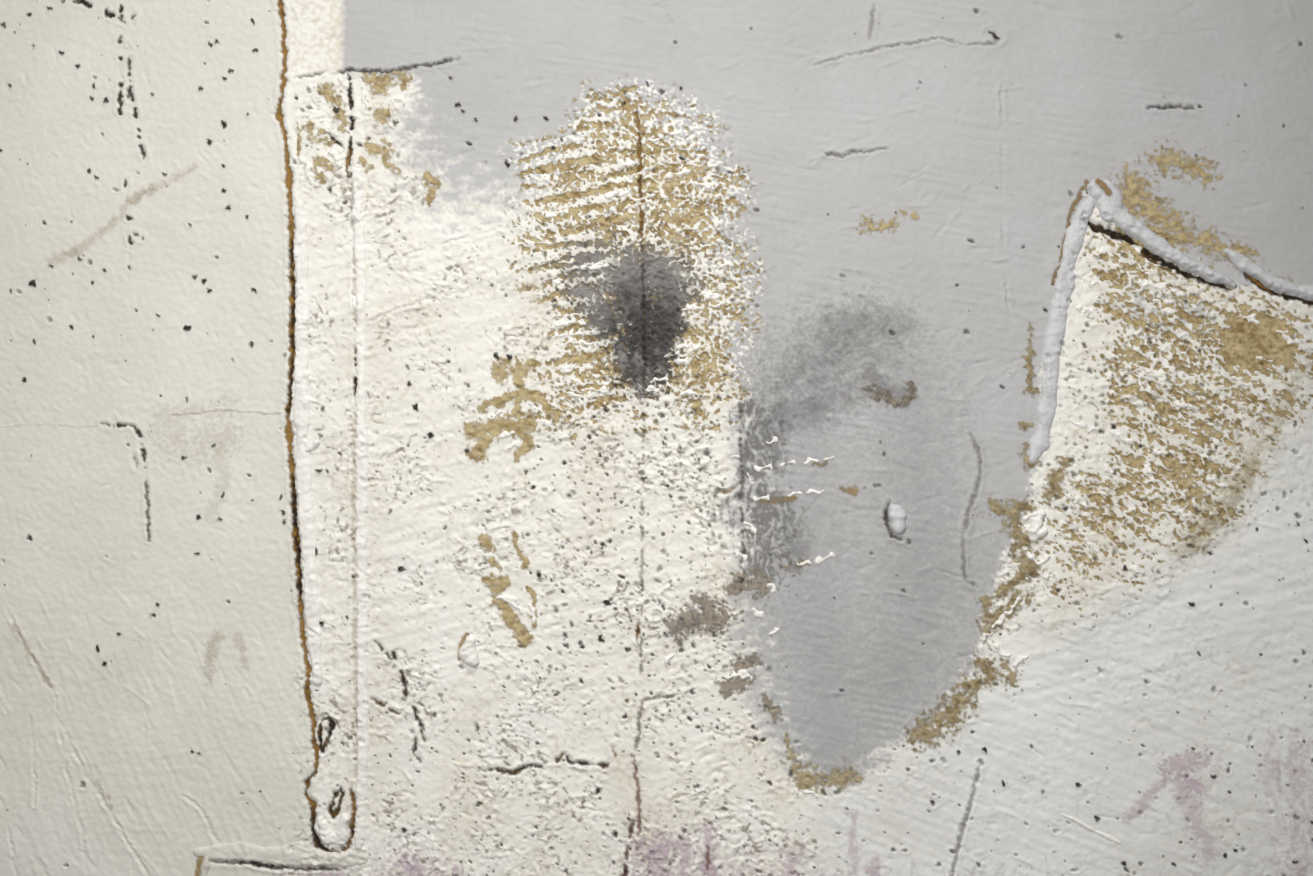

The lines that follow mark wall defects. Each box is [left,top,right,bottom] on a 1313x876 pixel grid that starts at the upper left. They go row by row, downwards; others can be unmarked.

crack [107,423,150,538]
crack [214,0,447,871]
peeling [464,81,765,463]
leakage [612,340,669,399]
peeling [905,145,1313,753]
crack [491,695,674,876]